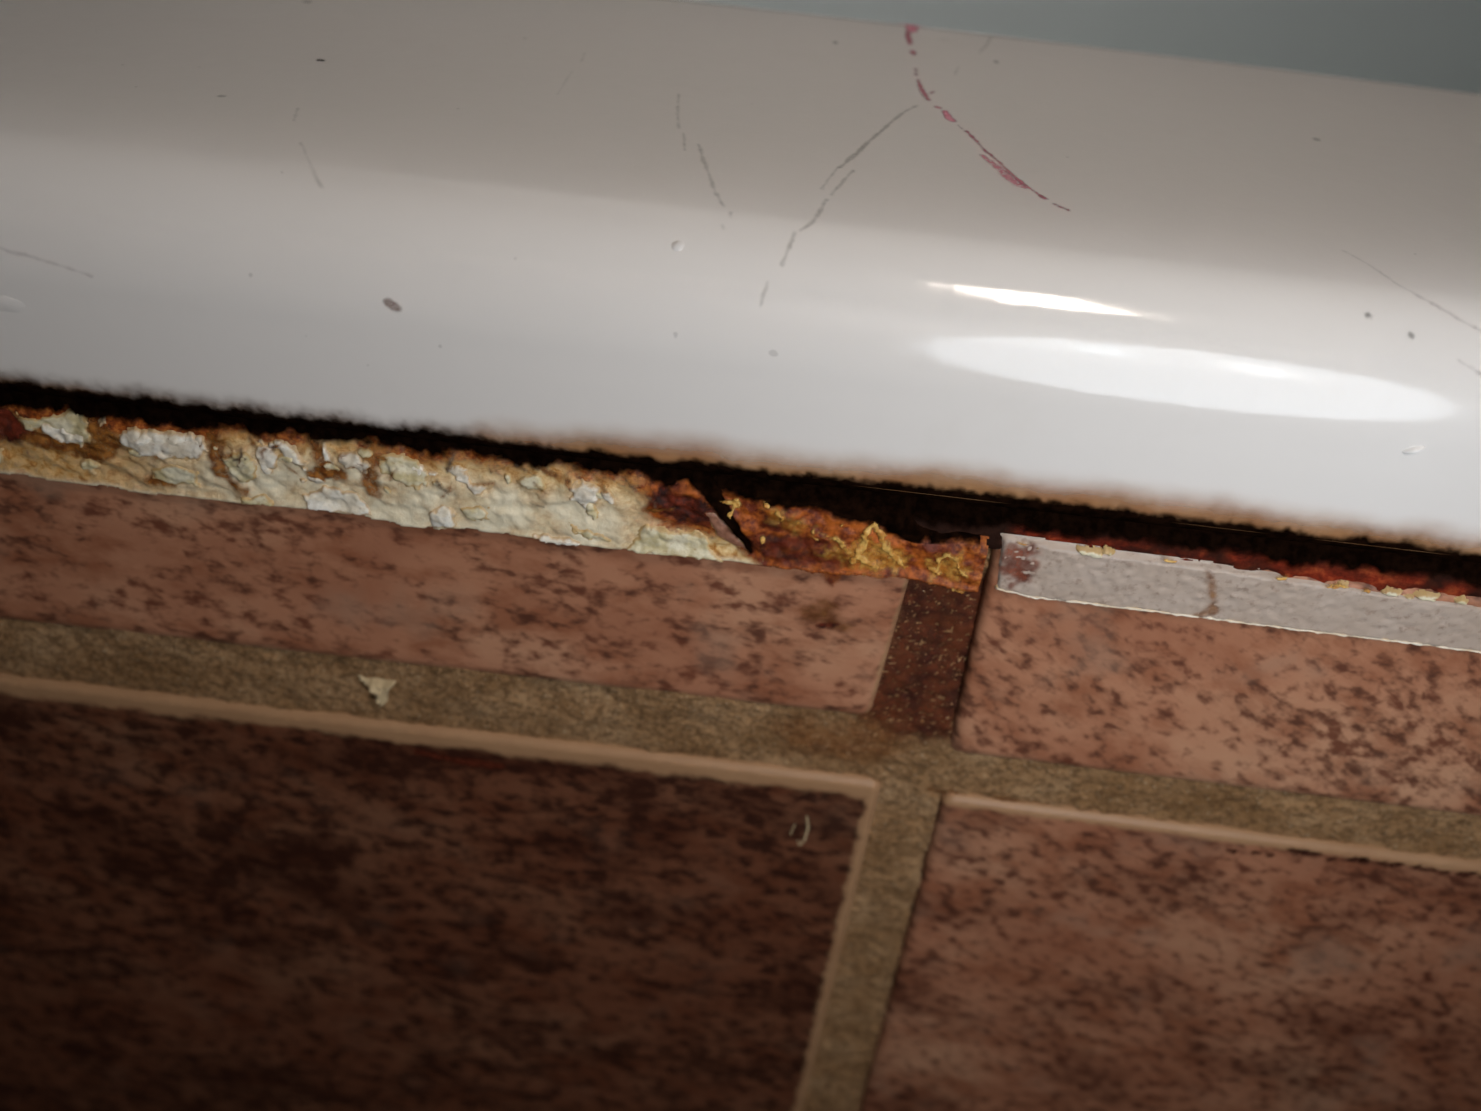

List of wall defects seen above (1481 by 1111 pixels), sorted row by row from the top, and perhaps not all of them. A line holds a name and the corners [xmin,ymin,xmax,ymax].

rust [0,408,121,462]
water stain [0,378,1481,587]
rust [510,439,1481,555]
rust [646,479,1481,739]